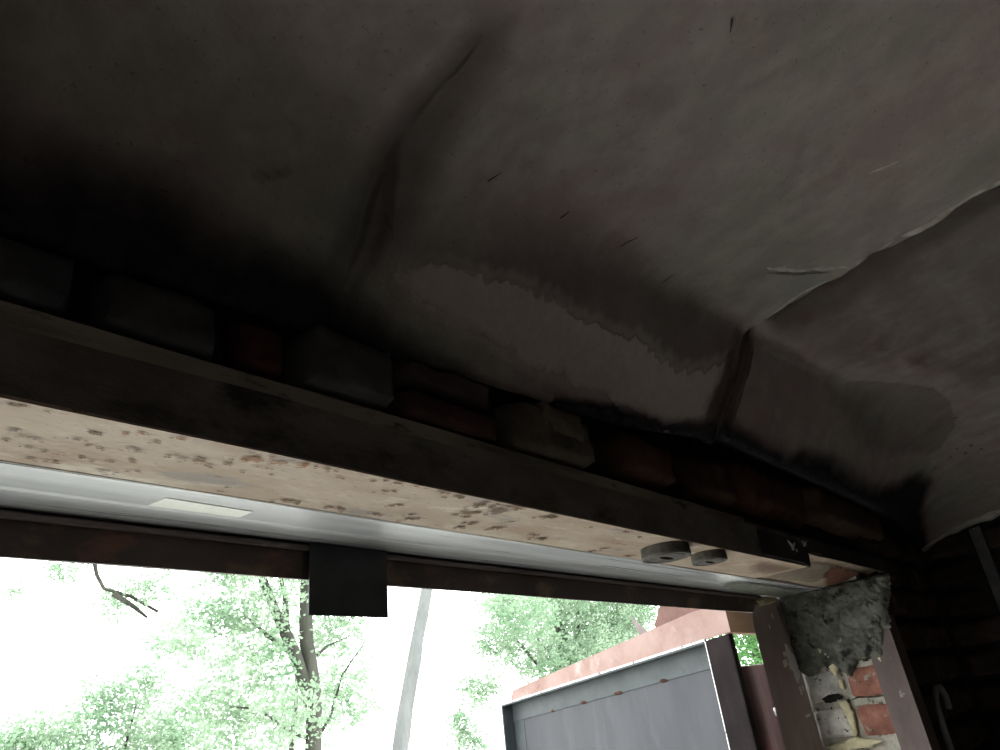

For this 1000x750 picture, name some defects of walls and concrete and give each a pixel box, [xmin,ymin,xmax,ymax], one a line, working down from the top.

damp [400,263,730,424]
peeling [782,643,804,695]